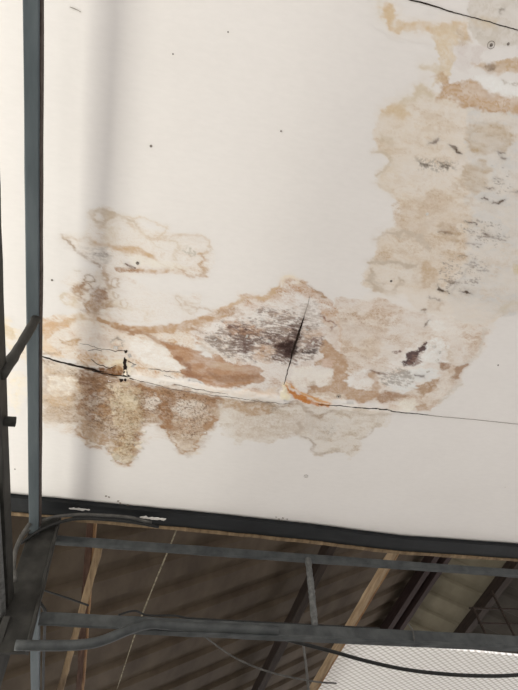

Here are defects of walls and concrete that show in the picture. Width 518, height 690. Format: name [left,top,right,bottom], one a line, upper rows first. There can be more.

crack [410,0,517,30]
water stain [42,0,518,469]
crack [284,297,310,384]
peeling [107,346,147,464]
crack [42,343,290,404]
rust [285,381,331,408]
crack [319,404,512,424]